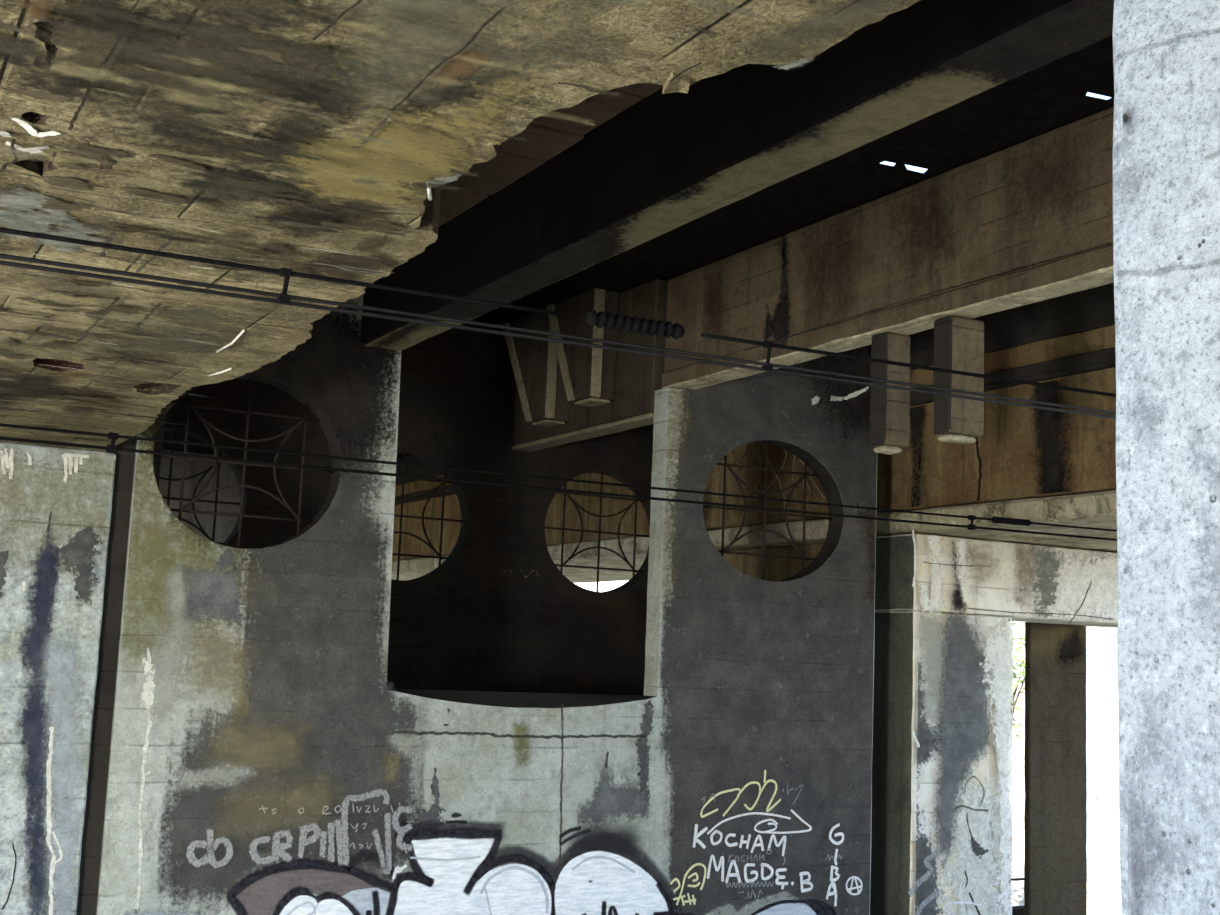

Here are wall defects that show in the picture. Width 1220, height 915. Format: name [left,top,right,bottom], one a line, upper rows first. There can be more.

peeling [1,87,73,125]
water stain [0,0,610,275]
peeling [0,131,418,294]
water stain [0,290,222,411]
peeling [0,272,303,448]
water stain [764,236,790,345]
crack [745,243,1113,351]
water stain [1021,547,1118,655]
water stain [912,530,1016,915]